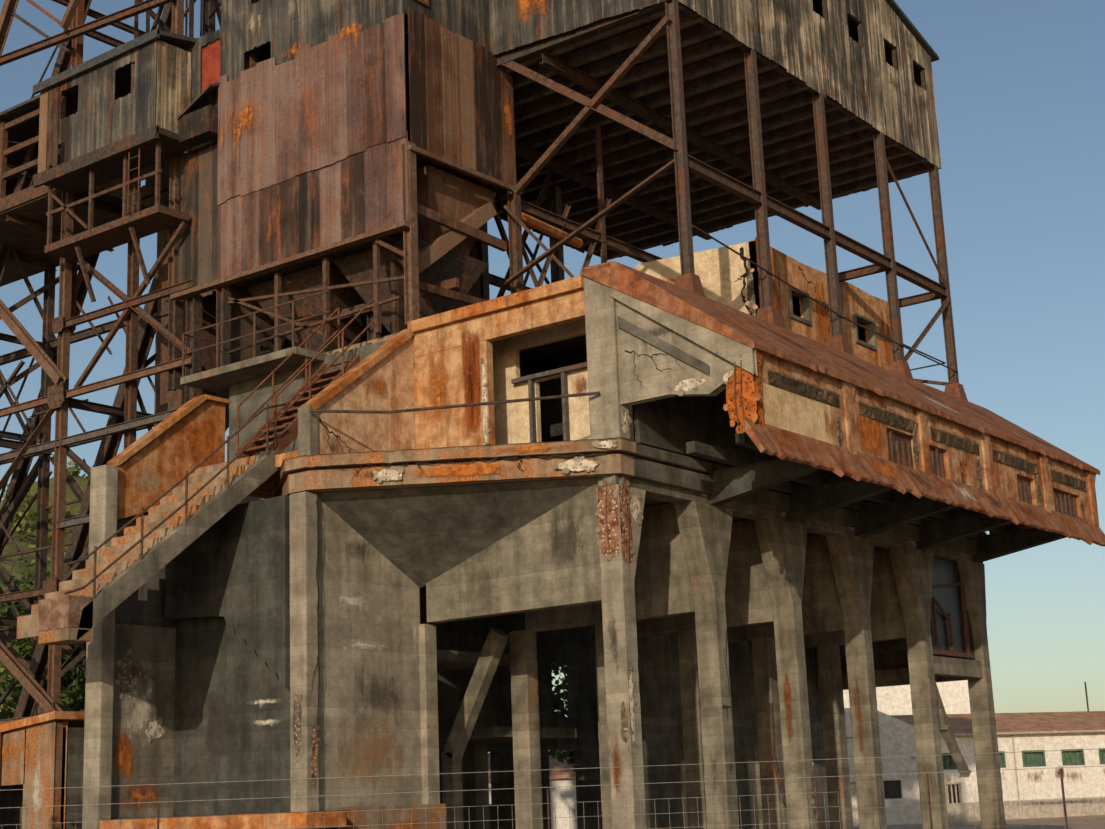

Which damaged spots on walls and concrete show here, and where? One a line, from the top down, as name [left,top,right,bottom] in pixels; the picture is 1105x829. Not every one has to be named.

corrosion [462,332,480,433]
spalling [591,407,632,448]
crack [625,350,680,386]
spalling [723,360,761,434]
spalling [372,468,404,483]
spalling [553,456,644,564]
crack [311,501,320,802]
flaking render [142,715,165,743]
corrosion [117,733,156,807]